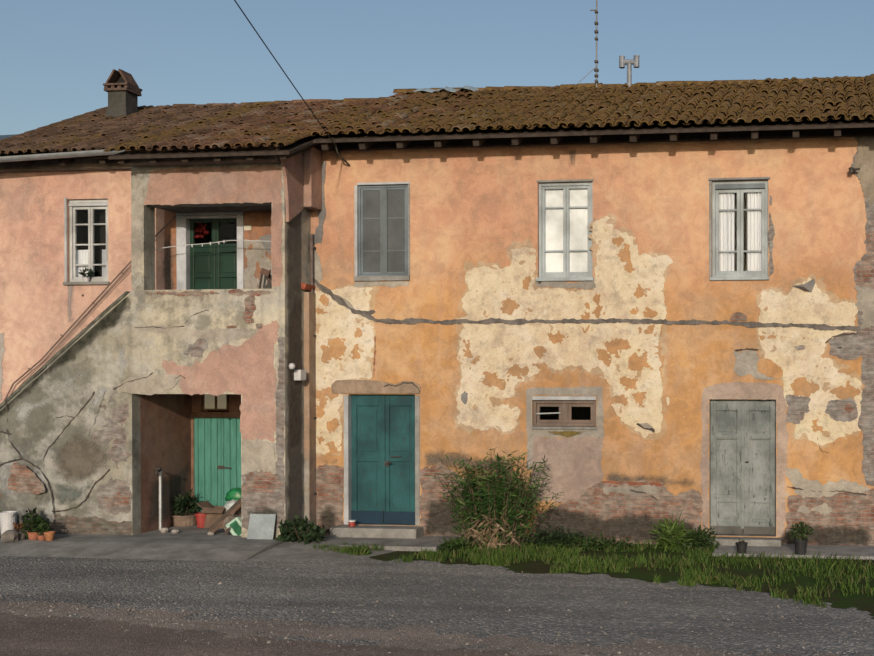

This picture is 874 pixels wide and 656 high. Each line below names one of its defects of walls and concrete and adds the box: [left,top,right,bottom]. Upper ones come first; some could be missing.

flaking render [0,463,45,498]
crack [0,372,153,514]
flaking render [184,337,208,358]
peeling [131,166,272,329]
flaking render [241,337,285,529]
peeling [304,284,379,536]
peeling [453,213,673,440]
crack [314,279,860,331]
peeling [730,136,874,546]